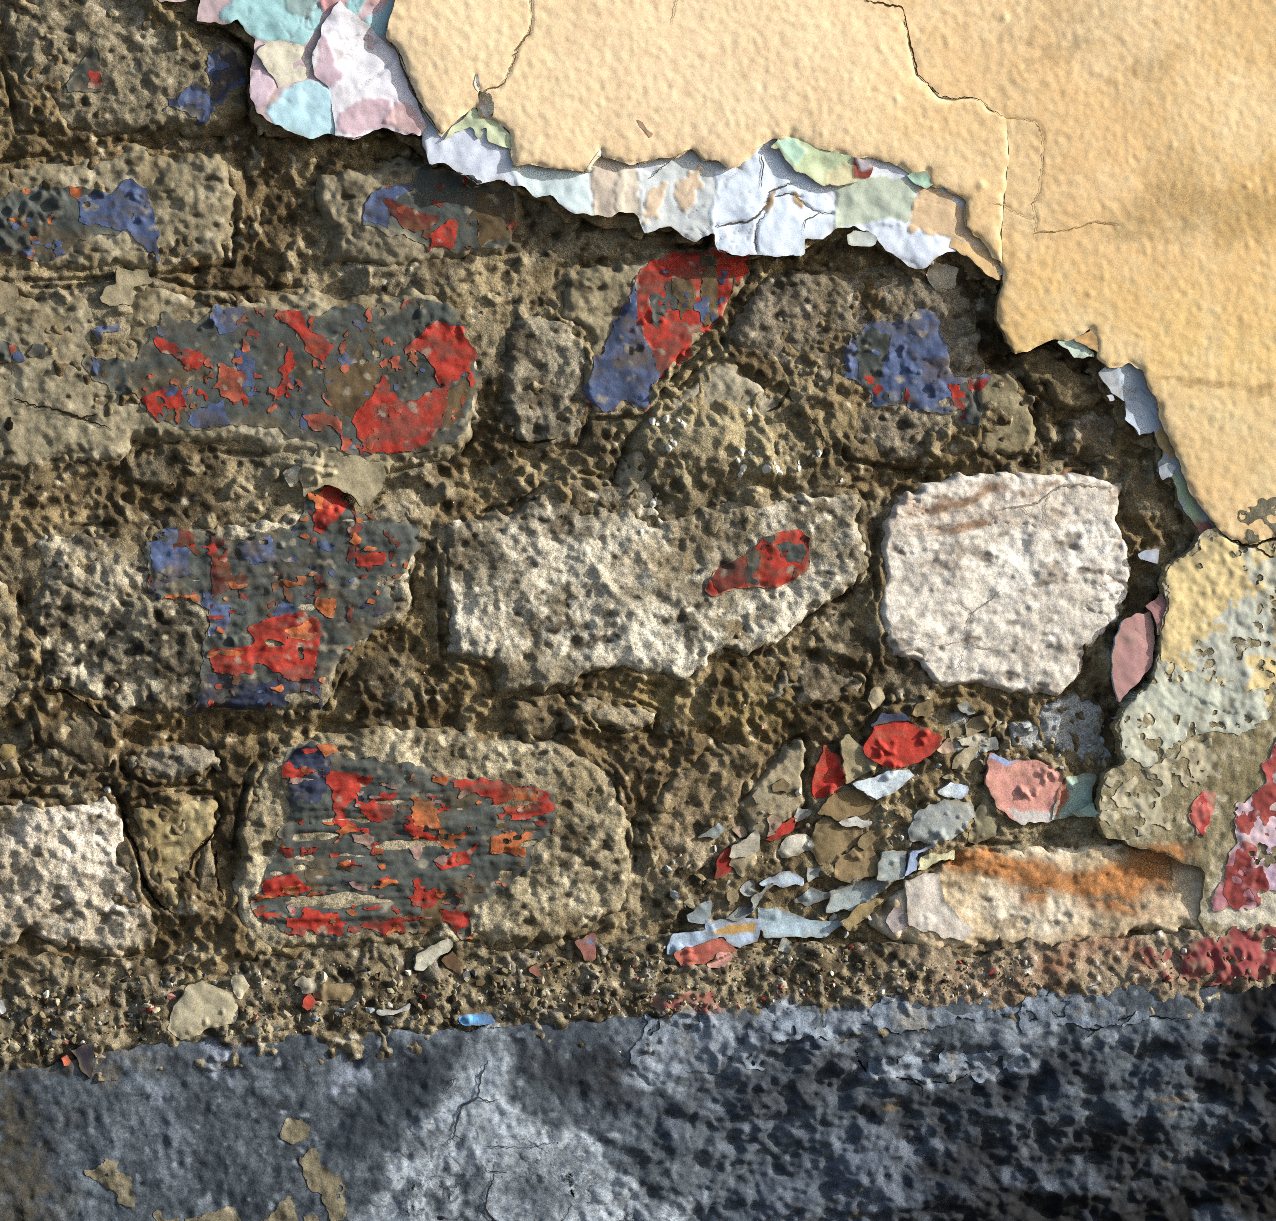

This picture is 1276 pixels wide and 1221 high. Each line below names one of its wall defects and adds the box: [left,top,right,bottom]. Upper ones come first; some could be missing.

crack [476,0,533,92]
crack [866,0,1118,238]
peeling [0,178,160,306]
flaking render [158,0,1003,426]
crack [715,155,832,251]
peeling [82,297,487,718]
peeling [666,331,1276,968]
peeling [250,741,558,976]
peeling [458,1012,495,1026]
peeling [1139,923,1276,989]
peeling [260,1118,347,1221]
crack [446,1061,552,1221]